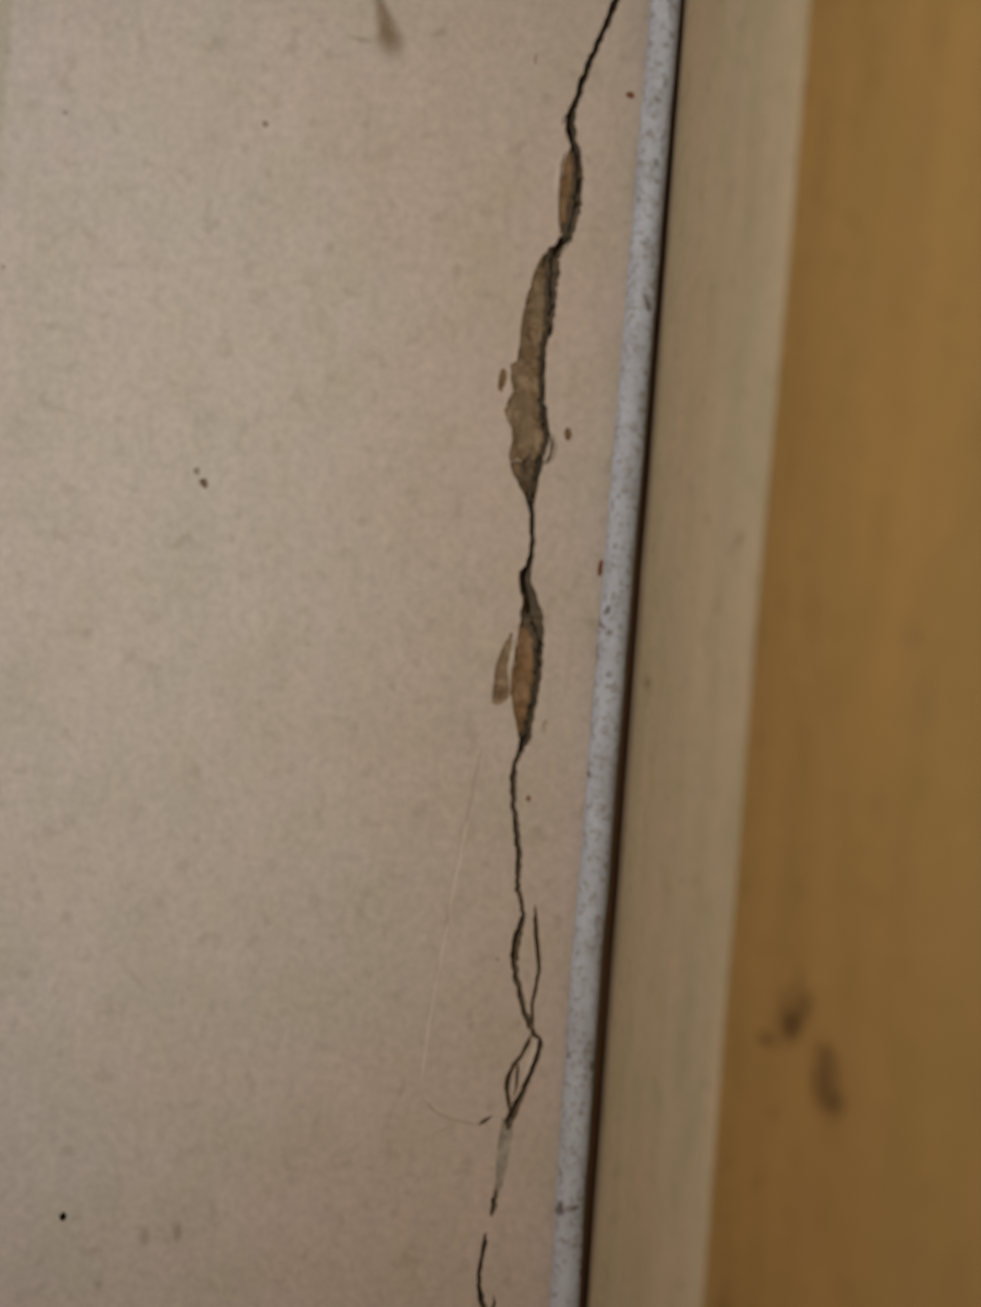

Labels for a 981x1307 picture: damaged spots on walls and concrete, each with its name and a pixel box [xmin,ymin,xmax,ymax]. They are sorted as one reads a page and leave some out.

flaking render [498,149,573,506]
flaking render [492,621,534,738]
crack [422,0,620,1307]